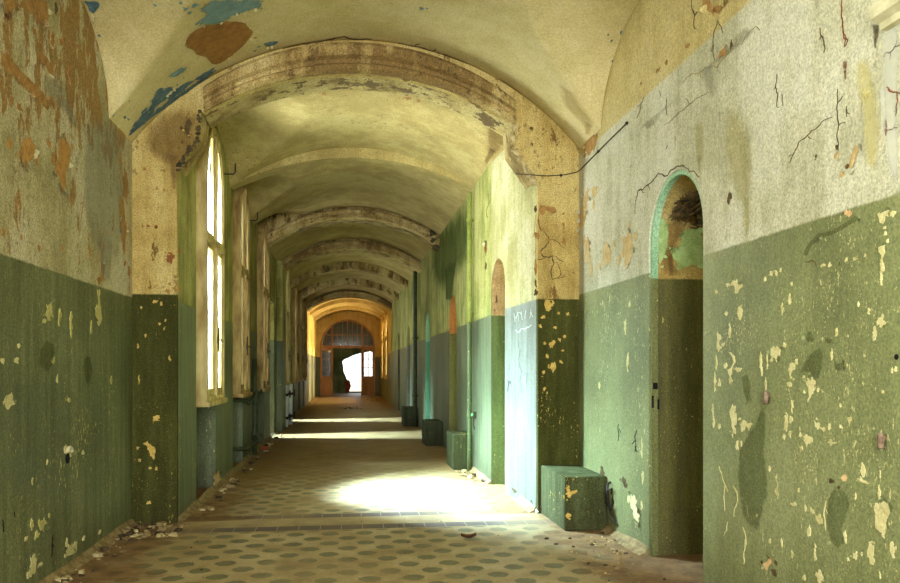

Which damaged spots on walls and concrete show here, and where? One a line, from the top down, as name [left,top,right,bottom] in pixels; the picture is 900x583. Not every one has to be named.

crack [819,0,848,53]
peeling [111,0,279,183]
crack [635,0,760,204]
crack [789,89,850,162]
crack [532,215,564,280]
peeling [658,190,703,270]
peeling [541,326,566,391]
peeling [713,305,743,392]
peeling [787,359,819,402]
peeling [711,403,752,450]
peeling [782,400,852,450]
peeling [829,462,897,579]